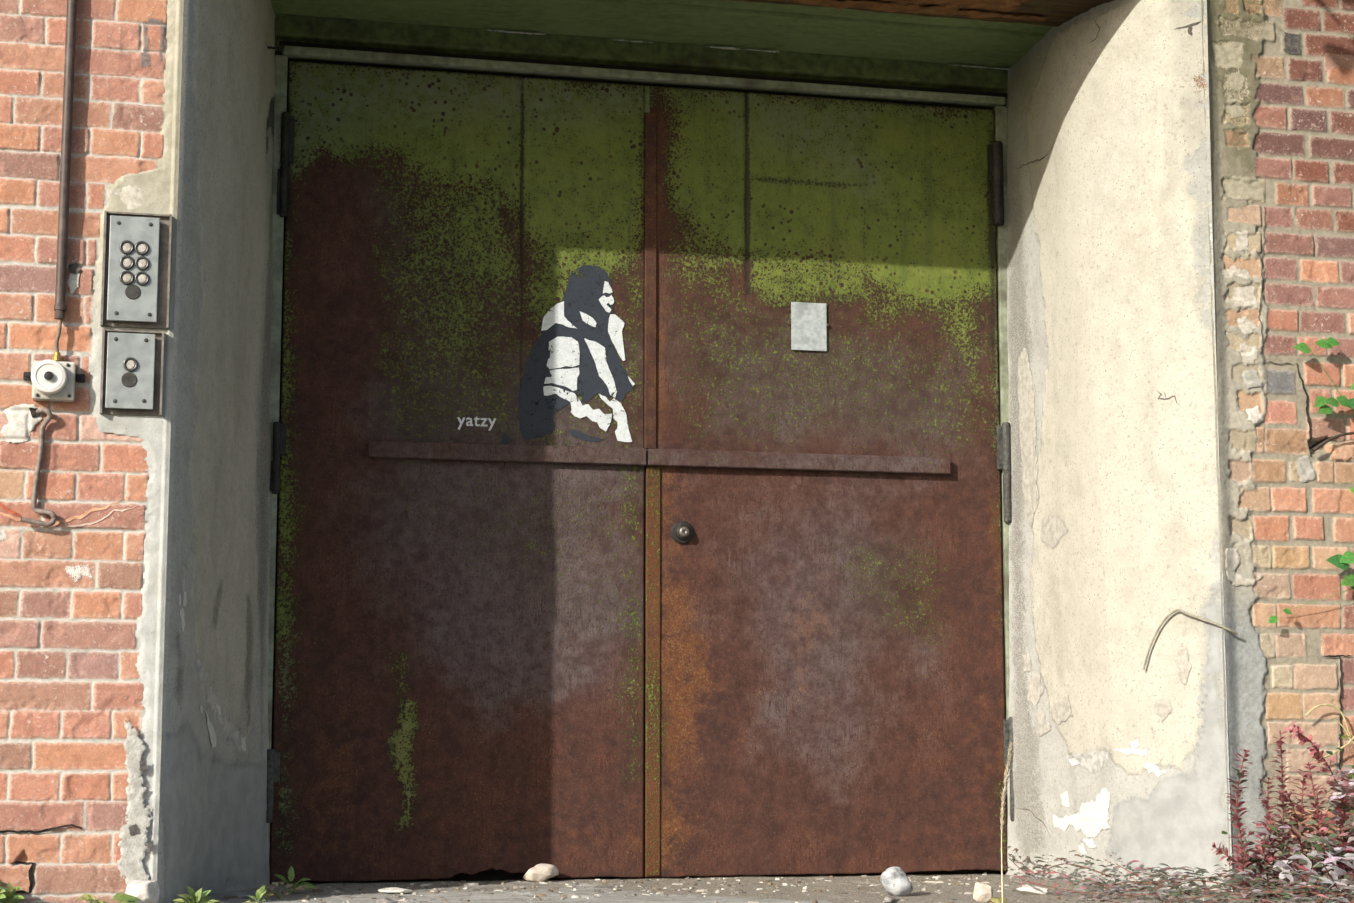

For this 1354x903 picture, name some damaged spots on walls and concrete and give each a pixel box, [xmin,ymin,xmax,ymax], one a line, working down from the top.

crack [1258,207,1333,457]
crack [0,824,82,894]
flaking render [117,722,154,885]
peeling [1053,739,1166,855]